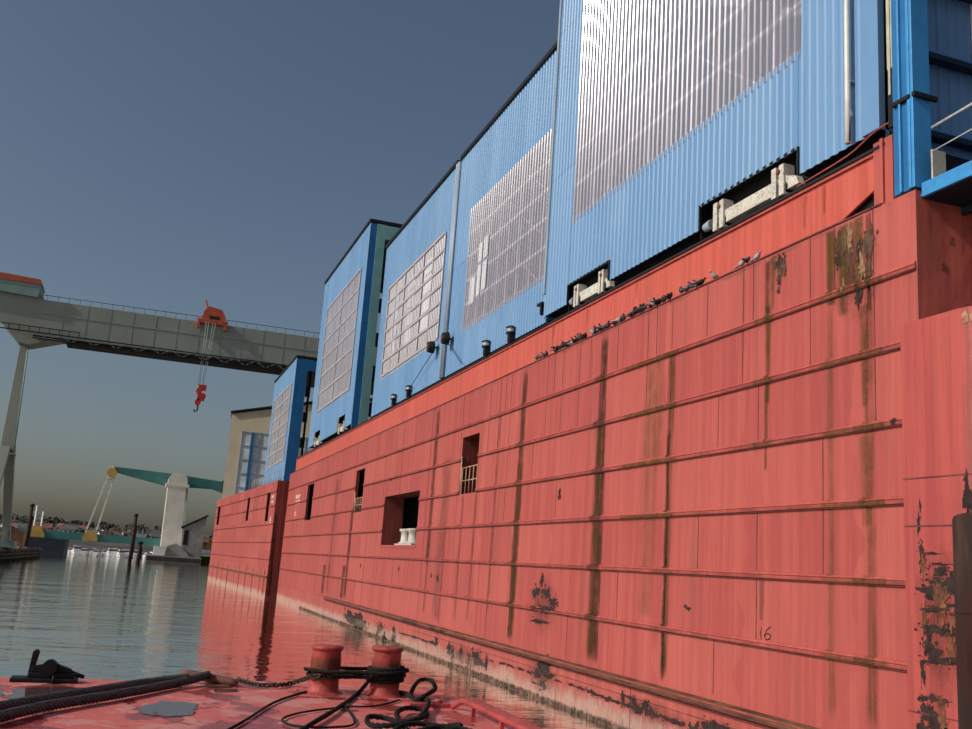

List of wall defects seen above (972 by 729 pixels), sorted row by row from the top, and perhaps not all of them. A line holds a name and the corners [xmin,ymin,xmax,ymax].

peeling [962,469,972,513]
peeling [914,538,956,729]